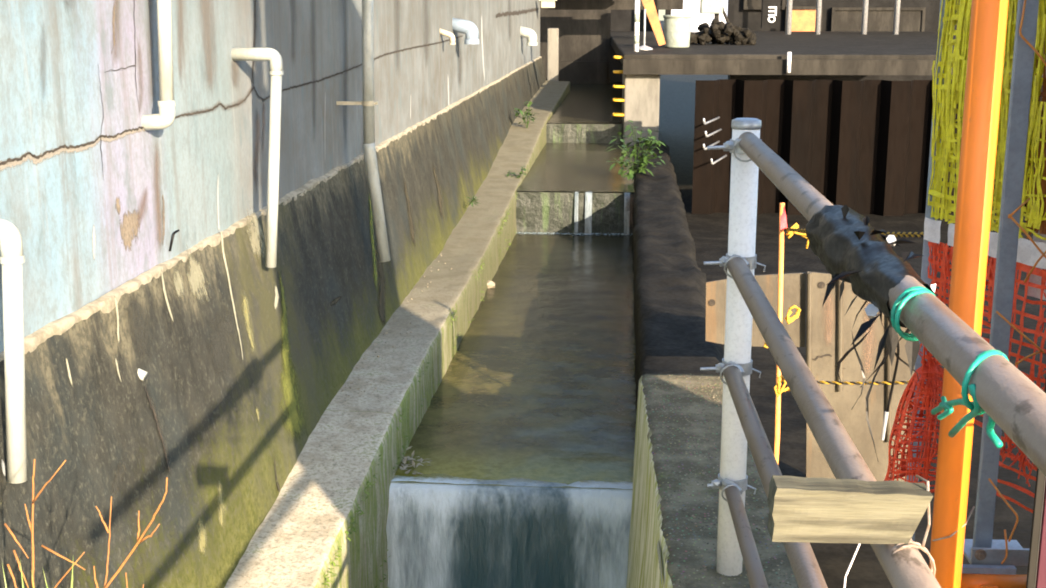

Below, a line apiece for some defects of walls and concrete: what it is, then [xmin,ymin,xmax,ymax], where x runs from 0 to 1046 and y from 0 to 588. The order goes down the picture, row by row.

crack [0,0,145,178]
crack [175,0,463,119]
peeling [115,197,140,251]